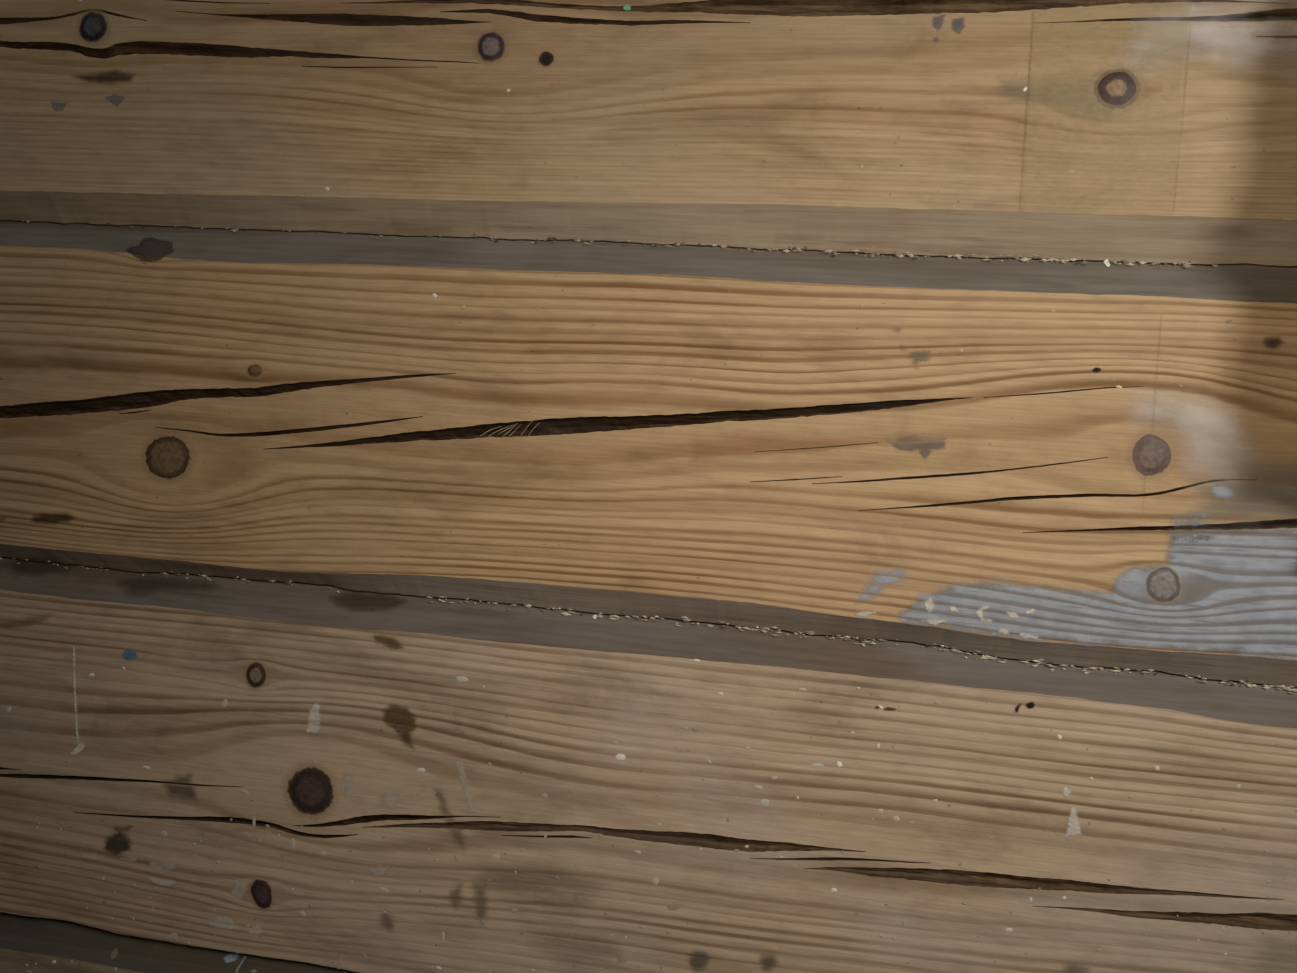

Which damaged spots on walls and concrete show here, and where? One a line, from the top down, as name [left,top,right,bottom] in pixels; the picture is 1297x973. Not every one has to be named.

crack [0,0,1297,68]
crack [0,373,1297,533]
crack [0,767,1297,931]